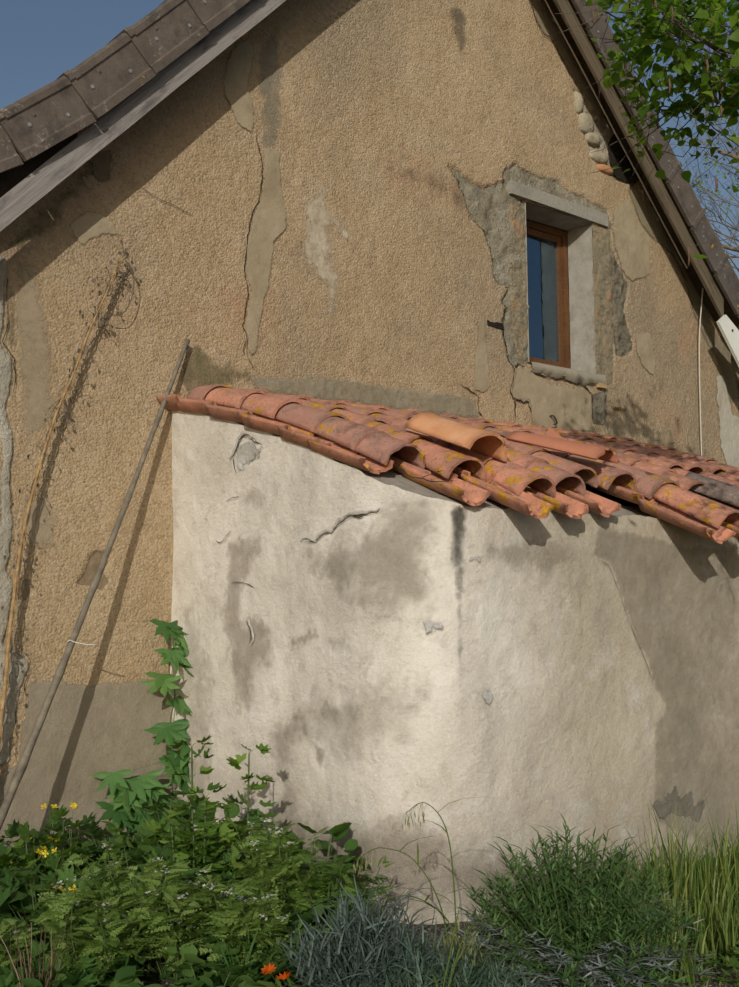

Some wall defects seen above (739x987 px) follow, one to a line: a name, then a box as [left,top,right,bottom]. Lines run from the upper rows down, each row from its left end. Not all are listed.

spalling [451,165,633,425]